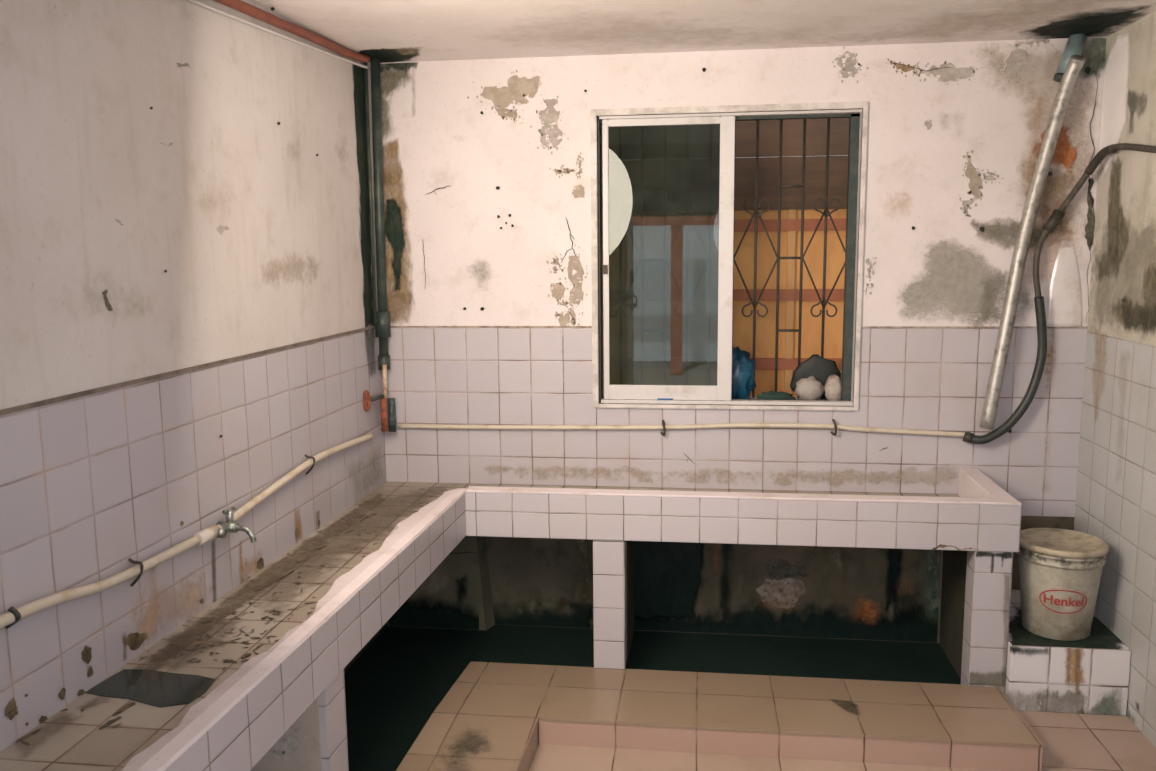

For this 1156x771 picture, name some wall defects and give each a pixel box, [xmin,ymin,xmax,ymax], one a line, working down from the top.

peeling [832,46,868,83]
spalling [888,11,1136,85]
peeling [467,70,585,199]
rust [1041,127,1077,227]
damp [1099,159,1128,276]
peeling [546,245,588,333]
damp [903,241,1006,322]
damp [389,577,479,630]
damp [493,539,593,628]
peeling [756,559,809,609]
damp [634,541,941,643]
rust [1068,648,1082,695]